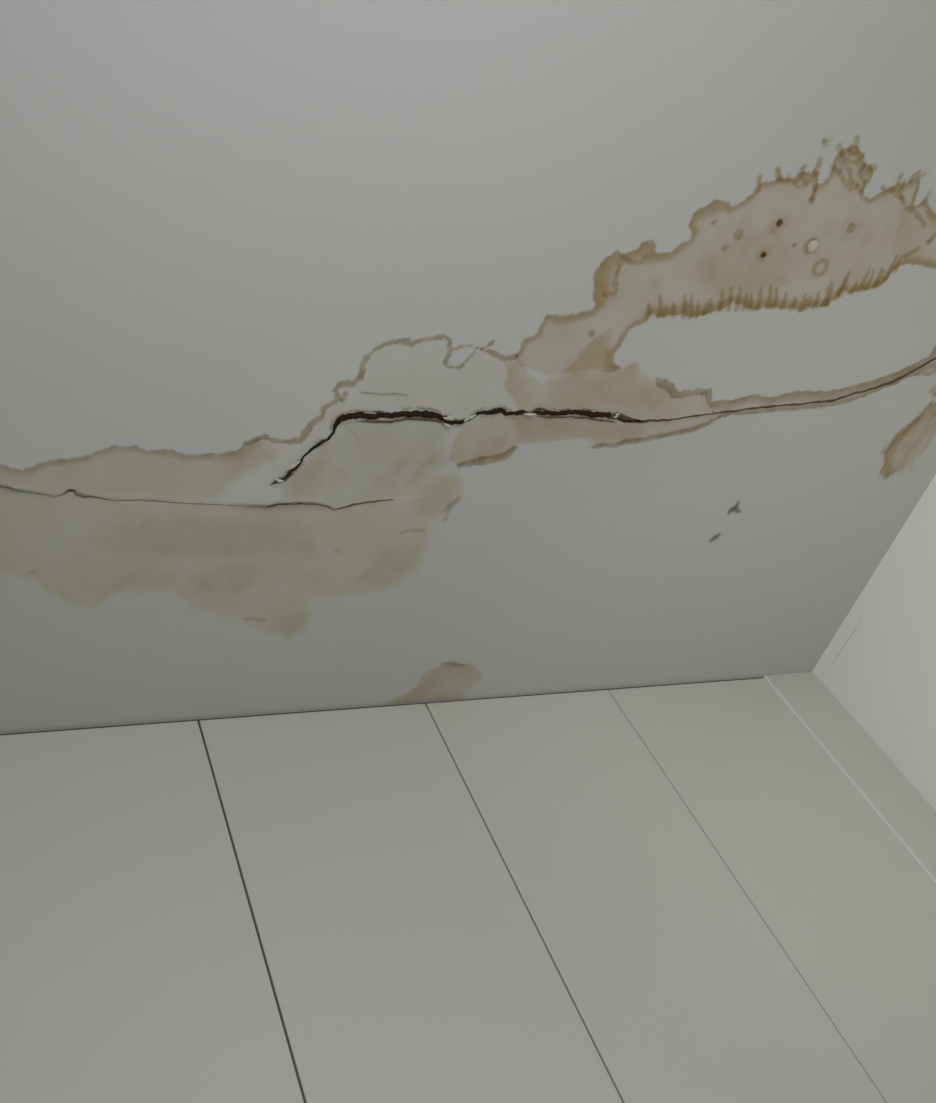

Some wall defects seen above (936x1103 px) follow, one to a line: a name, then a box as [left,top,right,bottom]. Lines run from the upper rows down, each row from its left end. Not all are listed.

crack [0,357,936,510]